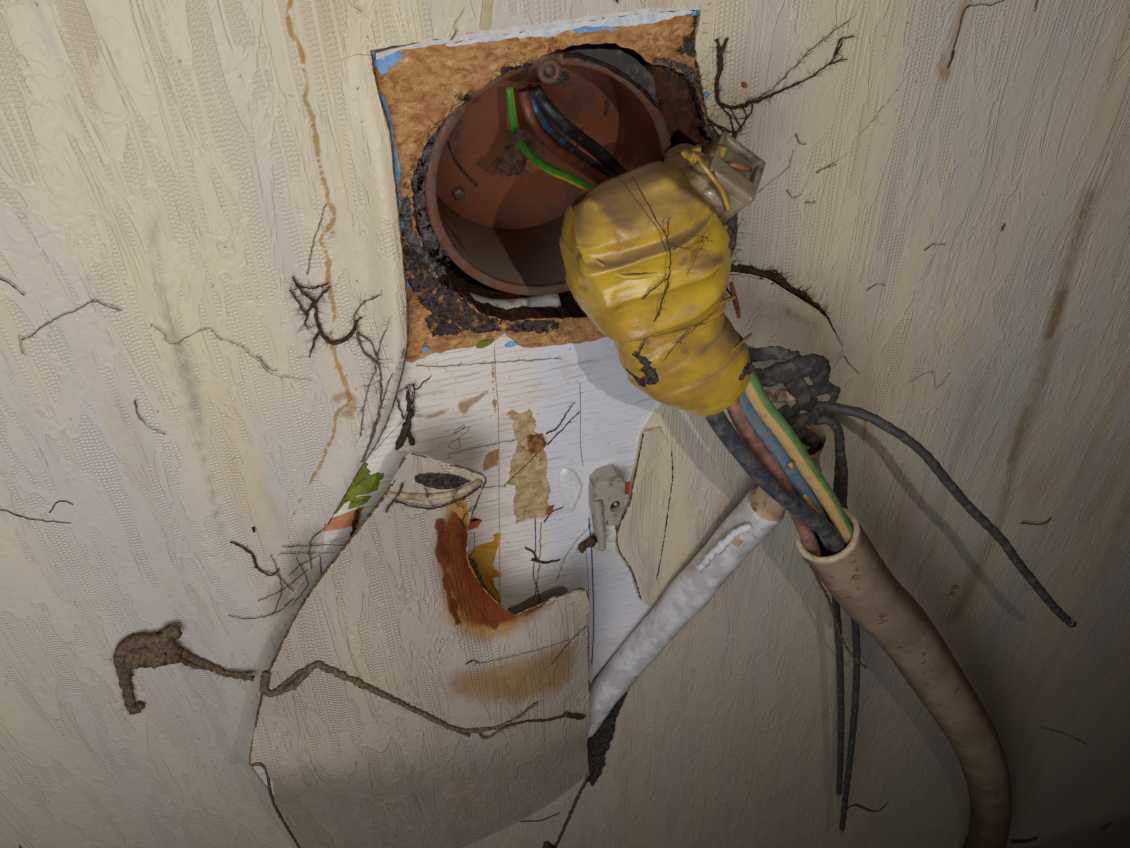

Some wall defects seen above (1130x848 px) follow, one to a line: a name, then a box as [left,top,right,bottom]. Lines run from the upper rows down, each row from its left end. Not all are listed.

damp [286,0,305,71]
peeling [370,50,402,74]
spalling [572,26,642,62]
spalling [379,93,500,291]
damp [304,91,352,484]
peeling [506,409,554,524]
corrosion [435,497,556,636]
peeling [249,450,590,848]
crack [520,770,591,848]